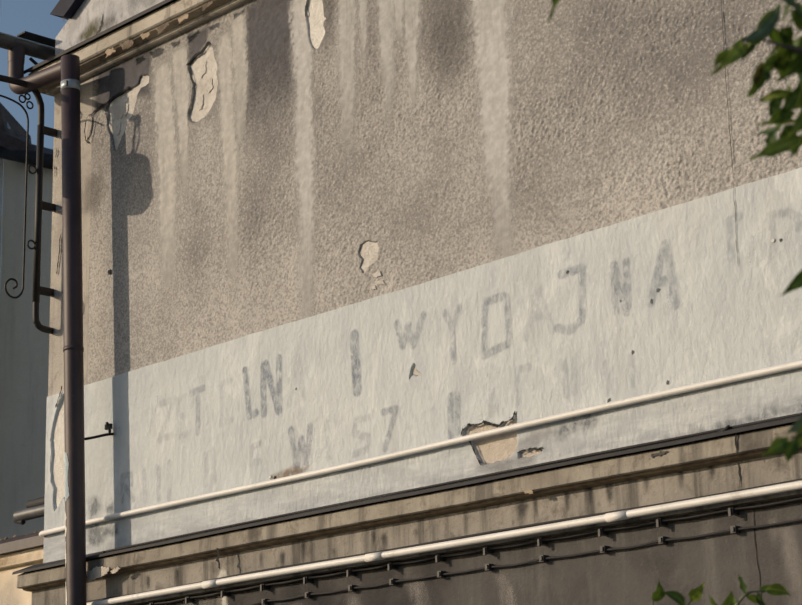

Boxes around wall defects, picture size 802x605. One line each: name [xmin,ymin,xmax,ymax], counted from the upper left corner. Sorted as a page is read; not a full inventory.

flaking render [93,75,149,150]
leakage [152,47,191,276]
flaking render [186,41,218,122]
leakage [216,13,248,264]
leakage [289,0,316,302]
flaking render [304,0,326,49]
leakage [336,0,421,129]
leakage [469,0,513,246]
crack [721,0,738,257]
flaking render [461,411,543,465]
crack [734,433,742,480]
crack [754,519,762,596]